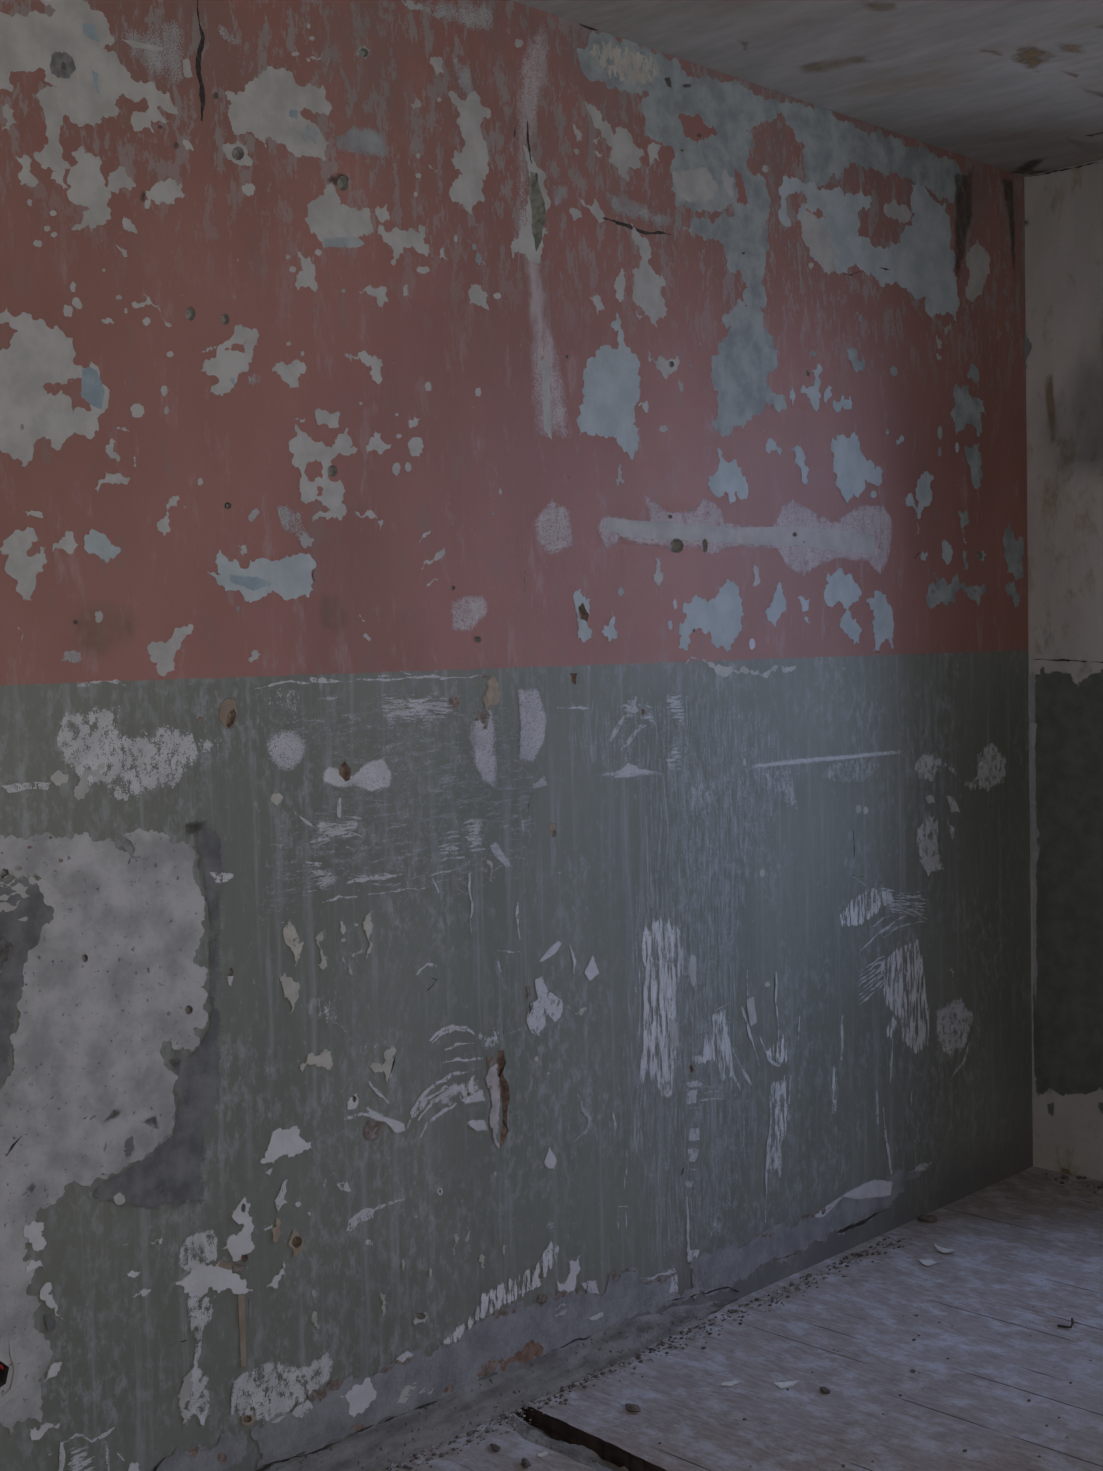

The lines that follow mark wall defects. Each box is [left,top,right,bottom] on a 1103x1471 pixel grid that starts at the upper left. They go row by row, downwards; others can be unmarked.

peeling [0,0,193,257]
peeling [0,281,145,492]
peeling [102,294,195,327]
peeling [201,314,307,396]
peeling [345,350,383,384]
peeling [510,31,991,504]
peeling [208,408,424,611]
peeling [2,698,238,803]
peeling [1033,667,1103,1116]
peeling [0,828,208,1440]
peeling [260,1126,315,1164]
spalling [127,1162,935,1471]